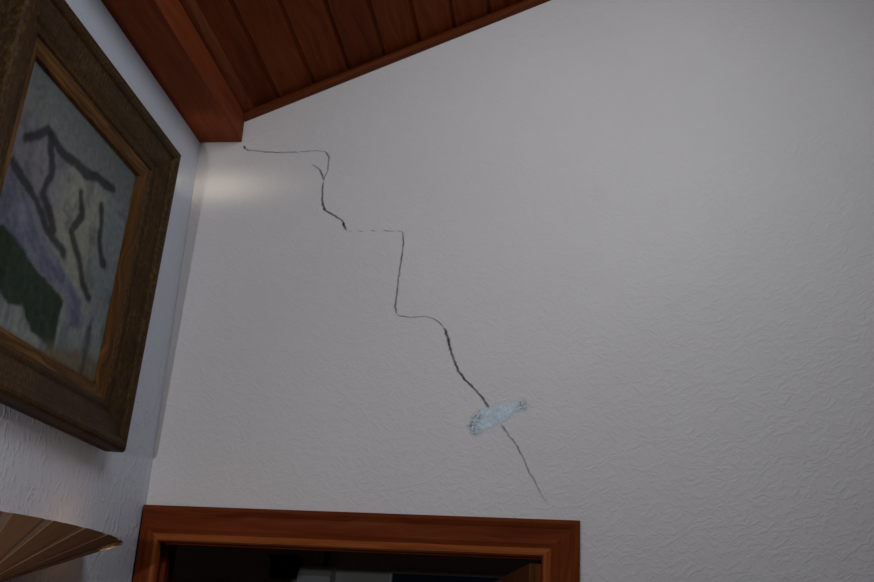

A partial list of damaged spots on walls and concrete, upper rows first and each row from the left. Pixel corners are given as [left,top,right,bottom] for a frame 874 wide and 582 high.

crack [316,150,346,229]
crack [436,320,489,407]